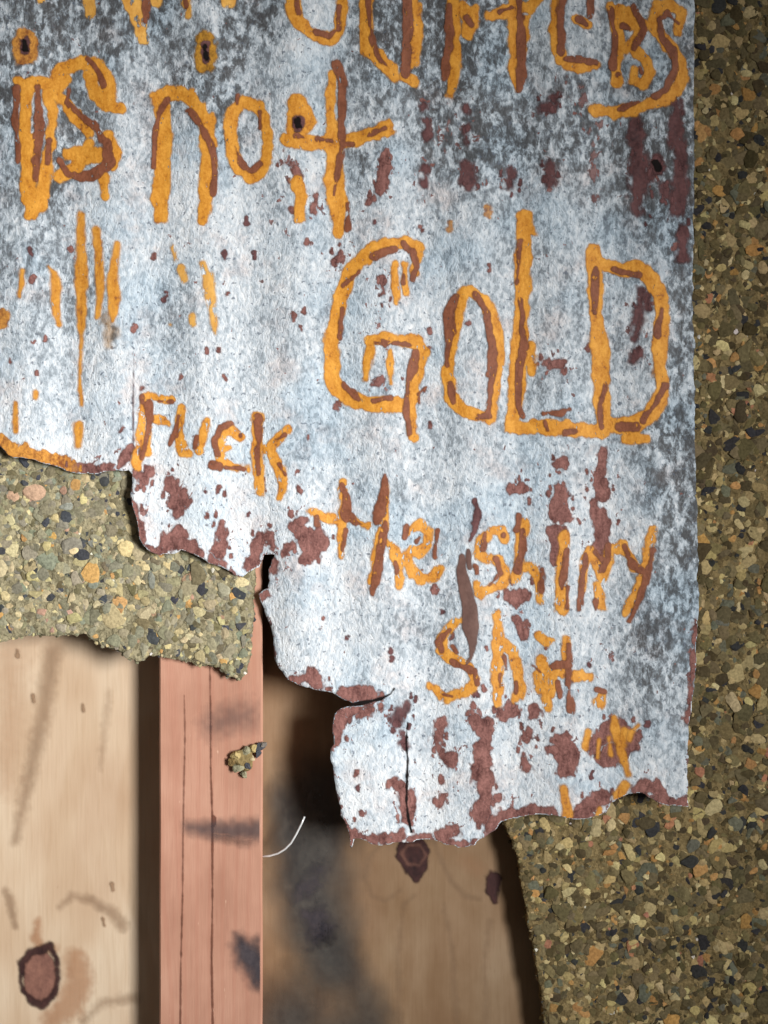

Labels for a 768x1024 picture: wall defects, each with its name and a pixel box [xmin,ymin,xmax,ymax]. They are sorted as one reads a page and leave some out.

corrosion [458,160,480,192]
corrosion [625,88,691,263]
corrosion [0,433,335,575]
corrosion [506,475,532,505]
corrosion [546,446,621,567]
peeling [0,447,257,681]
peeling [228,742,267,778]
corrosion [288,666,418,751]
crack [351,688,395,705]
crack [404,723,412,833]
corrosion [343,684,651,847]
corrosion [631,778,688,806]